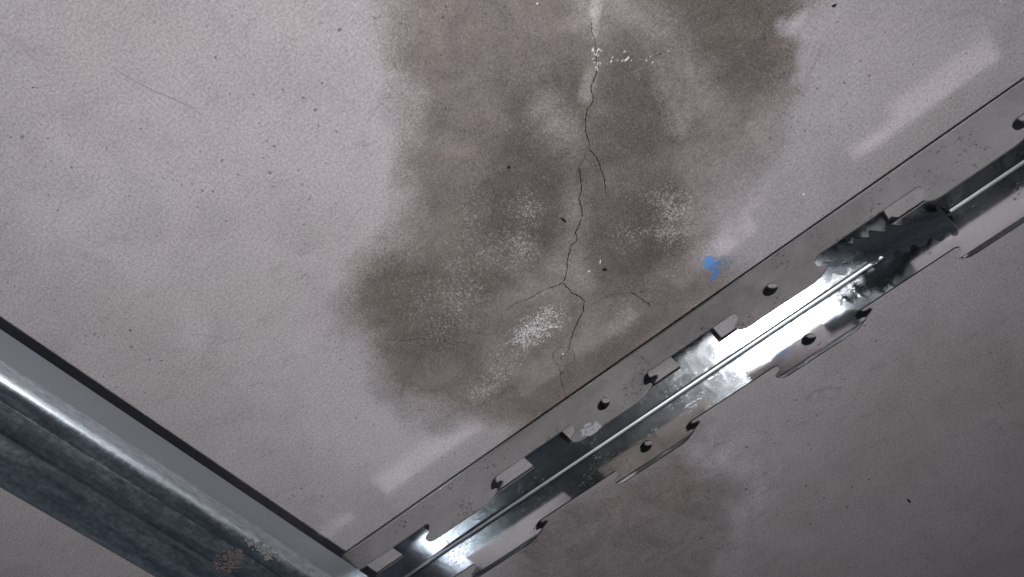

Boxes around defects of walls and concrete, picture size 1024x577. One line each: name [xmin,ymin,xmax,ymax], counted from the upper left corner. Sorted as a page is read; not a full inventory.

crack [387,22,651,399]
leakage [308,0,844,438]